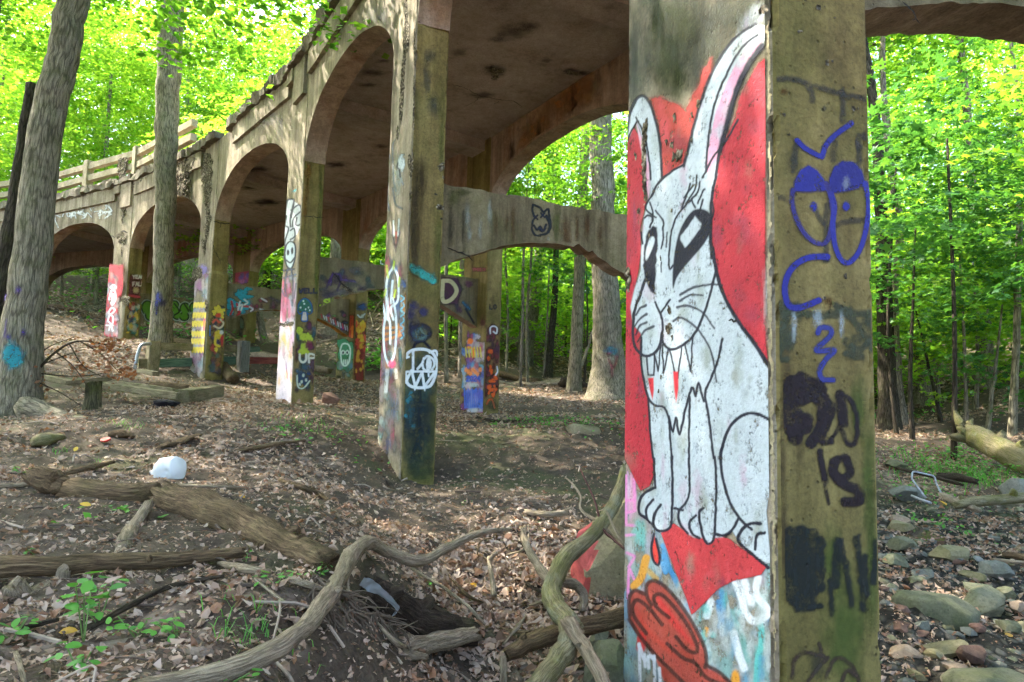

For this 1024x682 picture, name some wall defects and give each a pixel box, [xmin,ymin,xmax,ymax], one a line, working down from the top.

leakage [629,0,765,106]